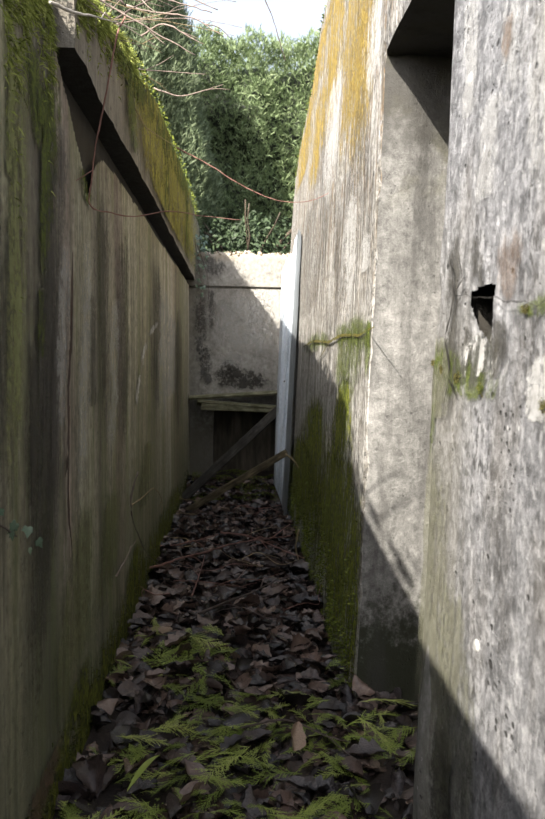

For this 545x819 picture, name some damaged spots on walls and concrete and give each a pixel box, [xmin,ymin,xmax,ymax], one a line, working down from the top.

leakage [25,131,66,661]
leakage [195,291,265,390]
leakage [289,317,371,688]
leakage [345,197,369,307]